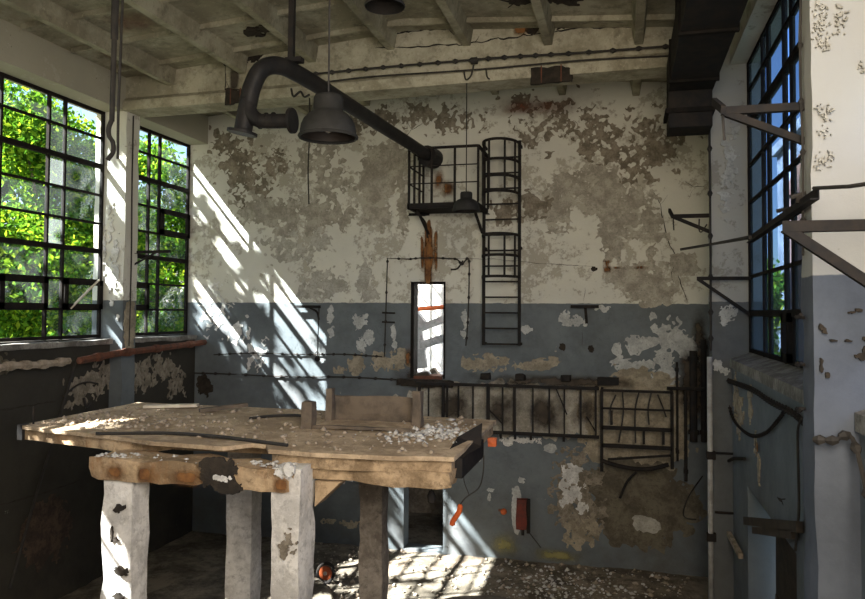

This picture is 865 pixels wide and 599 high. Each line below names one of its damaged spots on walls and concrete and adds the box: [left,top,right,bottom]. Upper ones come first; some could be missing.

spalling [225,88,242,106]
peeling [207,115,411,338]
corrosion [421,220,437,284]
peeling [197,278,269,373]
peeling [333,64,708,554]
peeling [719,304,738,326]
peeling [62,360,110,410]
peeling [134,351,187,400]
spalling [196,374,213,398]
spalling [199,457,243,495]
peeling [274,462,296,479]